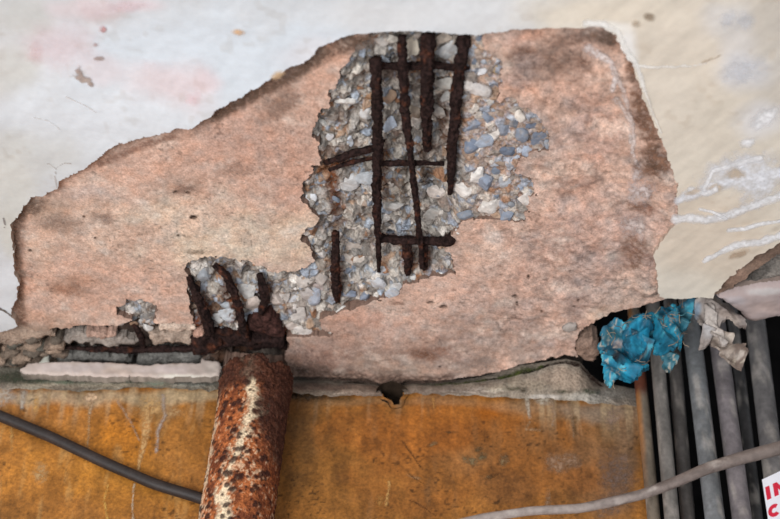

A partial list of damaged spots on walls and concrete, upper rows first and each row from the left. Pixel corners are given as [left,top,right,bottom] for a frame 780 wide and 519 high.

corrosion [65,262,288,356]
corrosion [330,230,343,304]
flaking render [3,26,678,409]
corrosion [317,31,471,276]
damp [688,156,763,196]
damp [671,192,780,263]